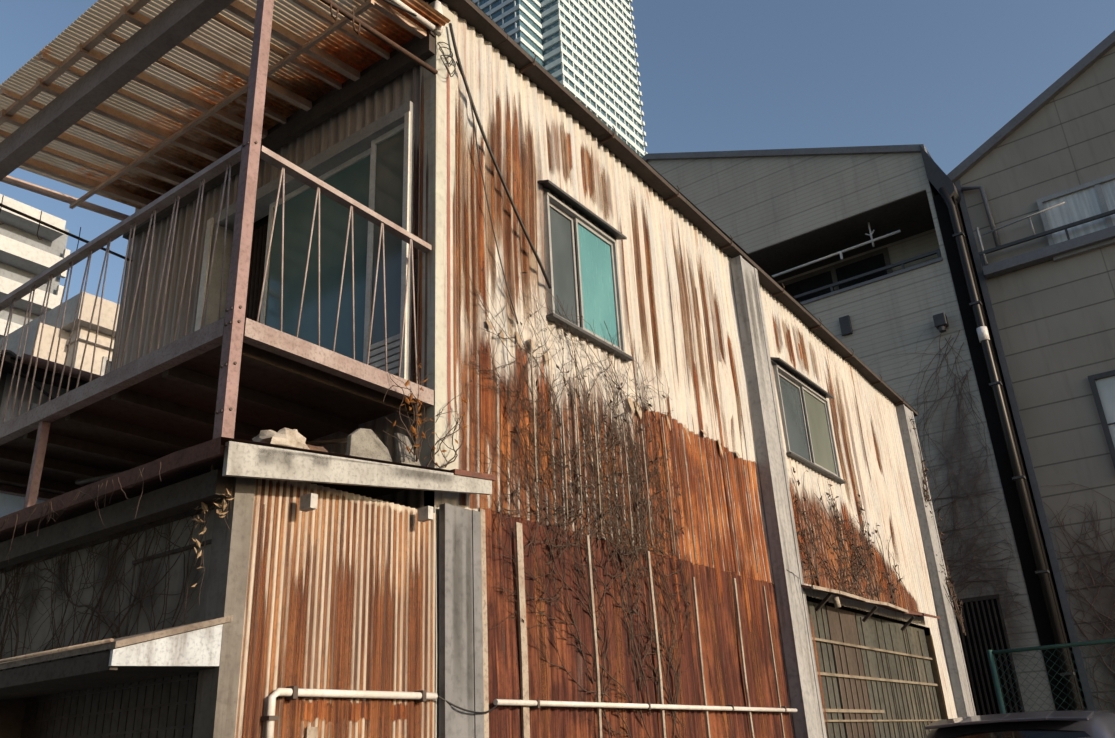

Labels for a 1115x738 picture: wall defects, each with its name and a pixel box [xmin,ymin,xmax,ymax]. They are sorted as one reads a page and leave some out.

rust [236,479,433,738]
rust [447,72,794,738]
rust [773,319,919,617]